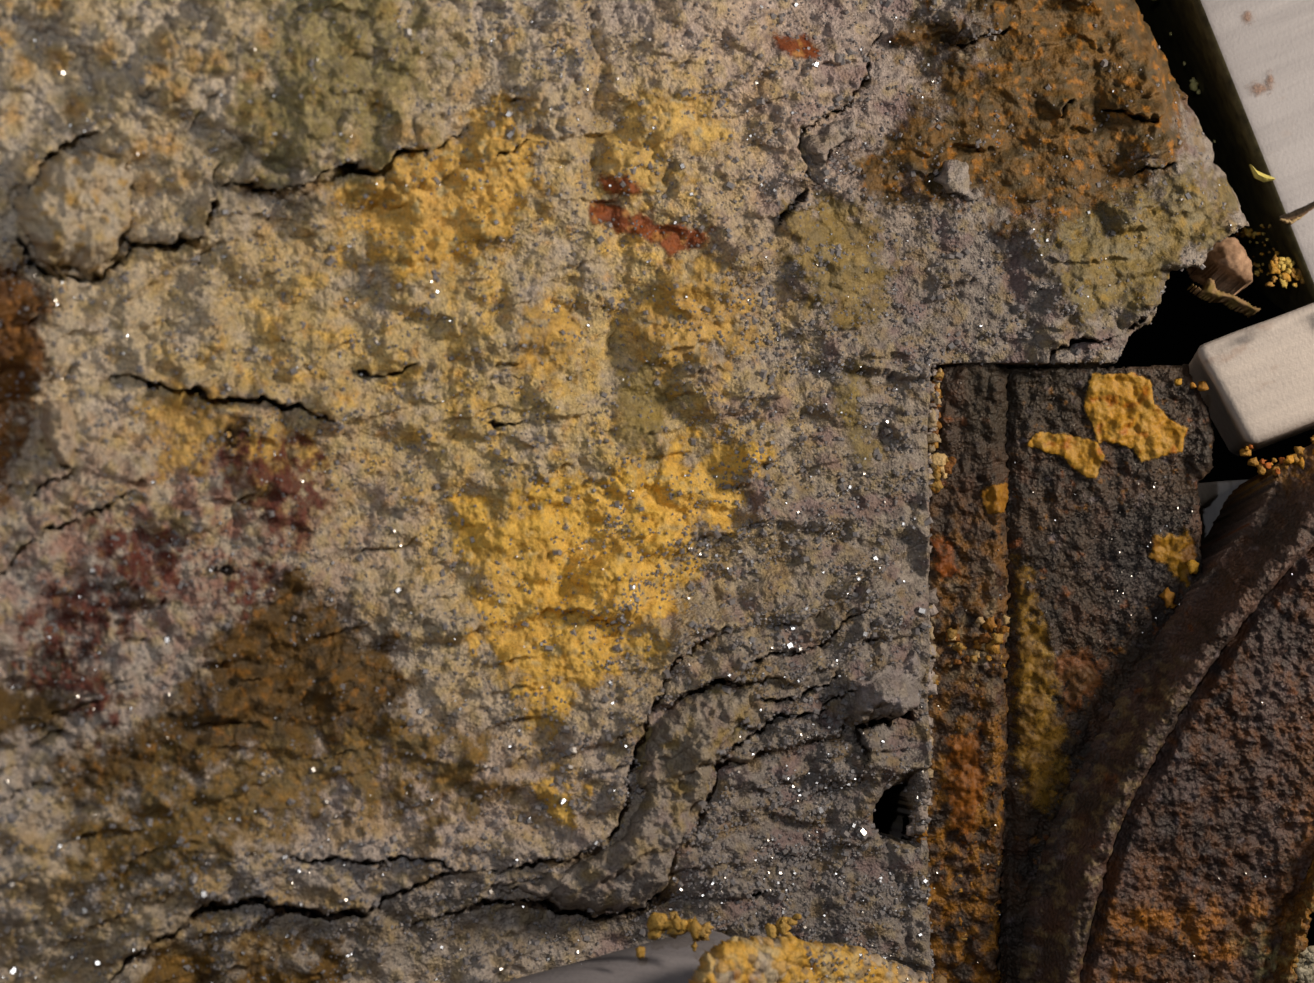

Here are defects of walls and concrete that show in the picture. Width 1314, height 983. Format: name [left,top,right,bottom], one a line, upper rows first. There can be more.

peeling [1183,61,1201,94]
crack [778,32,882,226]
rust [850,0,1197,241]
rust [588,174,713,257]
crack [1279,202,1314,220]
rust [0,262,61,509]
crack [106,374,338,425]
rust [981,482,1009,514]
peeling [945,614,1010,668]
spalling [873,801,893,834]
rust [943,717,990,844]
crack [114,851,658,975]